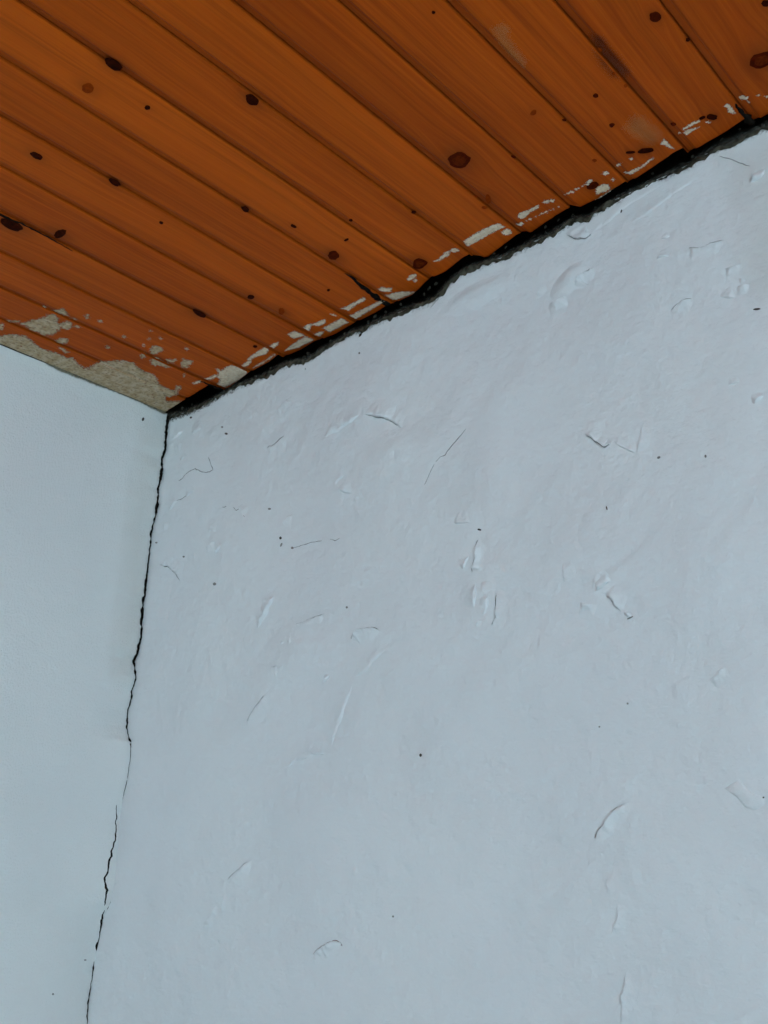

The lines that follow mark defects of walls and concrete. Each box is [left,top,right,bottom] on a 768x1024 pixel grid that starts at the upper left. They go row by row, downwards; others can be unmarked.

flaking render [169,126,768,420]
crack [86,414,213,1023]